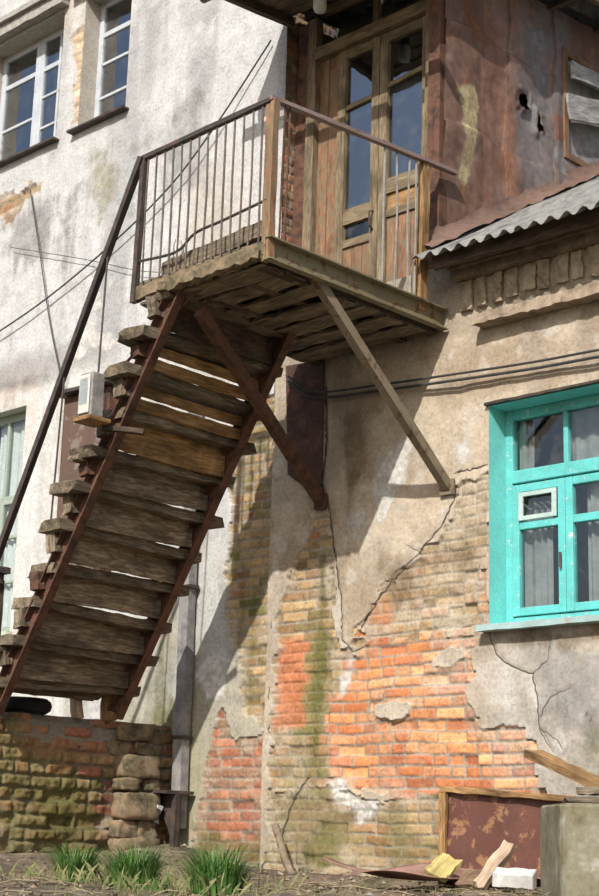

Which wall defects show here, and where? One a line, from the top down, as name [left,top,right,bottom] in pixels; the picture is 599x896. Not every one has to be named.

flaking render [69,22,85,125]
peeling [526,30,546,132]
flaking render [0,179,42,229]
flaking render [266,393,275,413]
crack [321,387,488,652]
flaking render [190,421,547,877]
crack [488,632,571,754]